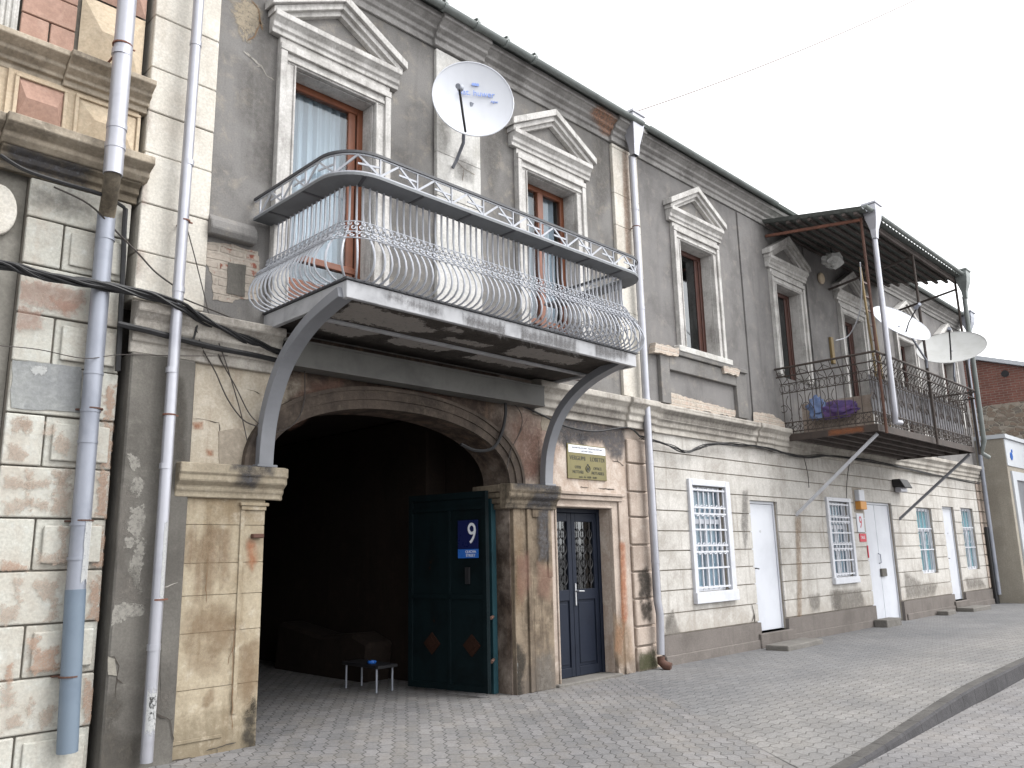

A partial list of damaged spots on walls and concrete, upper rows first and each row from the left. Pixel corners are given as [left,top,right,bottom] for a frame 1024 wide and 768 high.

flaking render [233,0,263,41]
flaking render [206,242,260,303]
water stain [234,464,272,488]
flaking render [81,385,146,627]
rust [616,544,627,650]
peeling [83,678,93,723]
water stain [243,699,257,747]